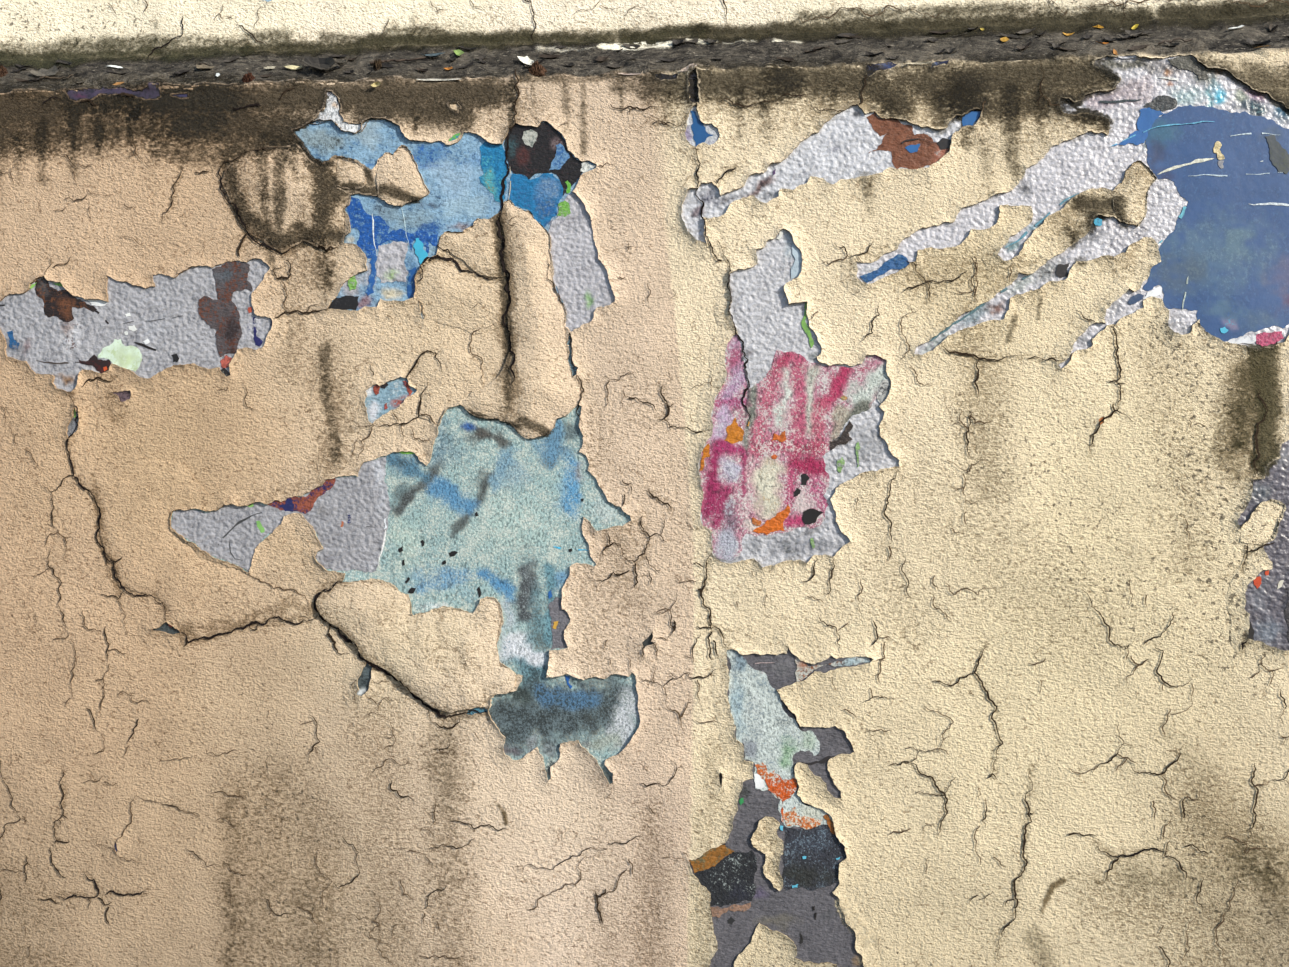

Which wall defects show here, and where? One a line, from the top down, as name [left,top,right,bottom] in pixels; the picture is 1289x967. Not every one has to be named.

peeling [0,245,288,453]
crack [0,376,506,964]
peeling [170,56,671,800]
crack [527,480,767,924]
peeling [674,631,888,967]
crack [822,242,978,385]
crack [802,558,1034,967]
crack [854,471,997,621]
peeling [618,38,1289,668]
crack [943,346,1062,534]
crack [1076,310,1134,450]
crack [1068,577,1289,967]